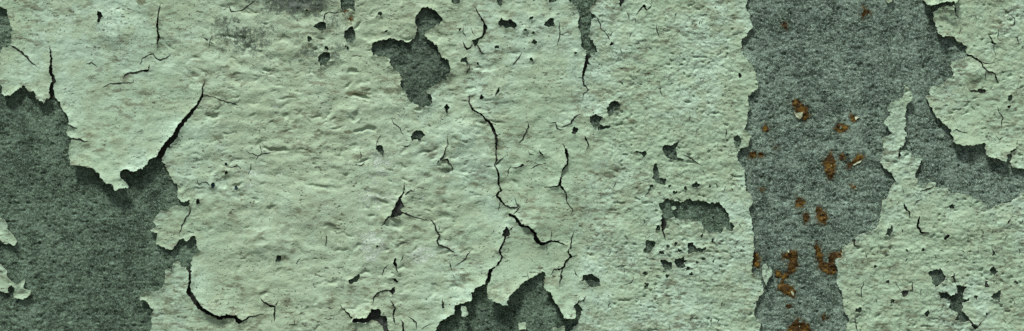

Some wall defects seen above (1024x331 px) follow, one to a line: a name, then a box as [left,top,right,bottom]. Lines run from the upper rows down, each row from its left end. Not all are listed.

crack [11,45,56,99]
peeling [0,6,204,331]
crack [157,80,237,159]
crack [179,181,295,325]
peeling [371,7,479,107]
crack [340,6,648,331]
peeling [431,226,601,331]
corrosion [775,250,811,331]
corrosion [795,198,828,224]
corrosion [814,244,843,274]
corrosion [823,153,863,181]
peeling [733,0,1024,331]